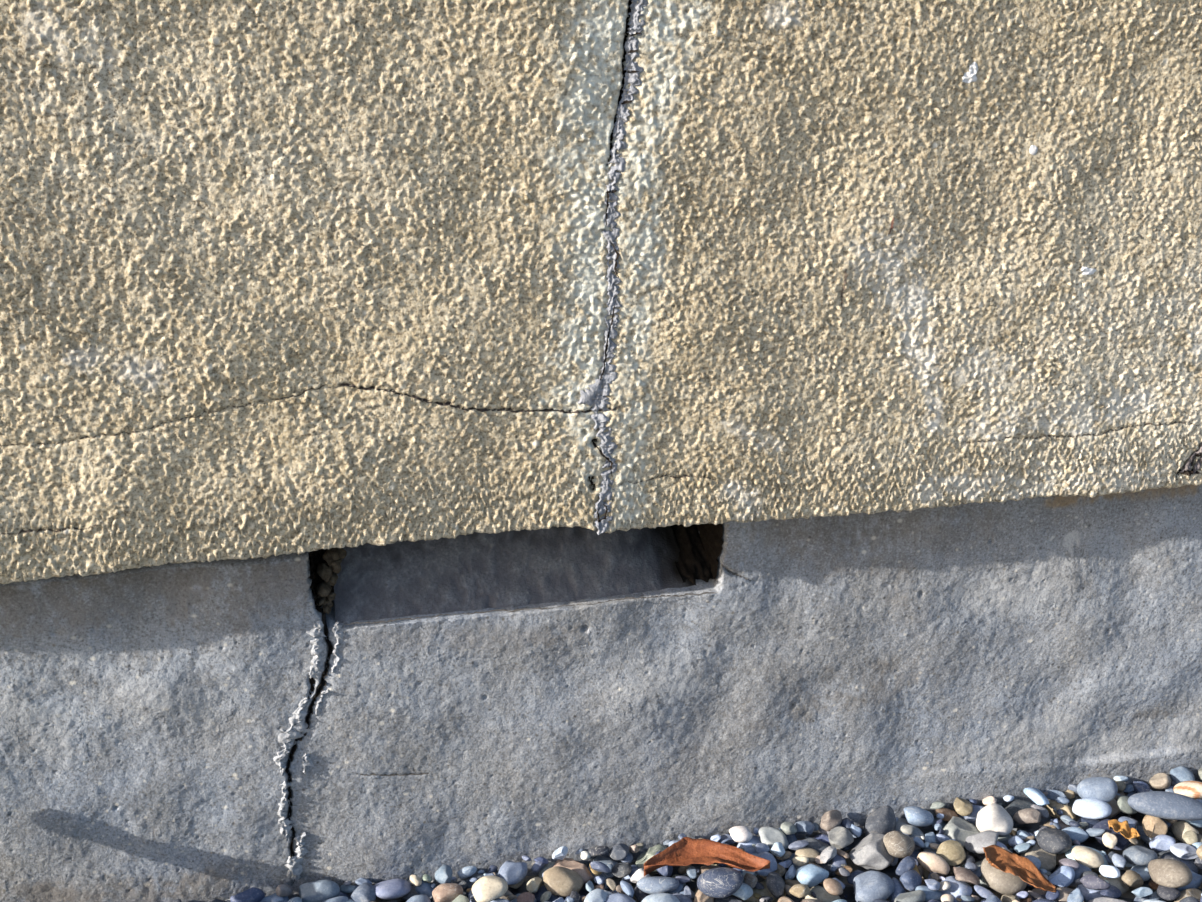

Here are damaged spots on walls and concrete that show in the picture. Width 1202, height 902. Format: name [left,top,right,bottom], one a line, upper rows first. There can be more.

crack [0,0,714,535]
crack [970,421,1202,480]
crack [273,548,751,884]